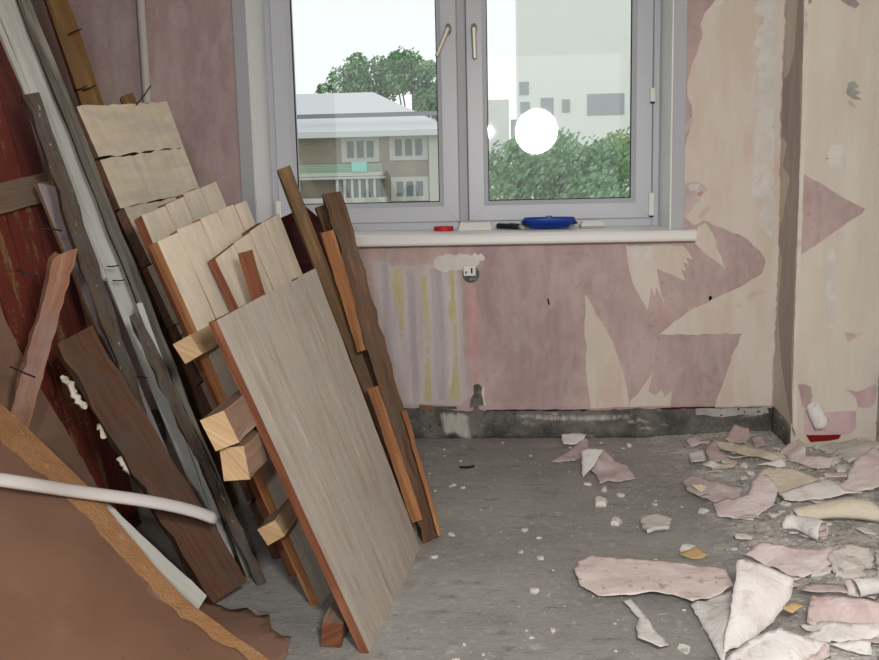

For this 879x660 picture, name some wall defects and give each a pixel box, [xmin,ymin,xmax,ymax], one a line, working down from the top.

flaking render [844,81,861,110]
peeling [793,0,809,431]
spalling [695,407,769,417]